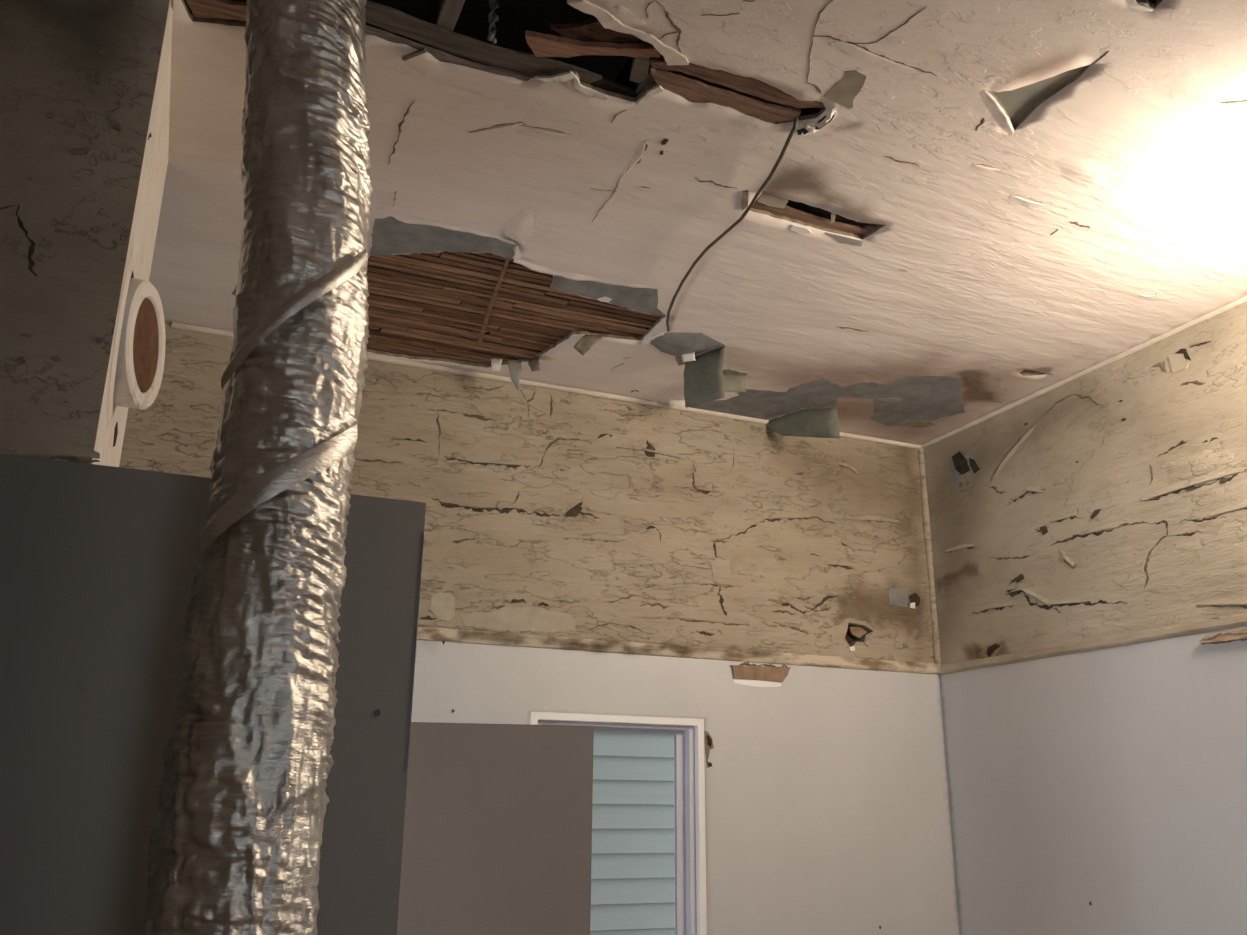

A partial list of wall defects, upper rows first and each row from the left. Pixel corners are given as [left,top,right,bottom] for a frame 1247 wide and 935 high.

spalling [171,0,247,21]
spalling [365,0,866,123]
crack [645,0,755,54]
crack [806,0,937,94]
peeling [976,51,1109,133]
crack [971,164,1090,235]
flaking render [366,213,966,439]
crack [1180,379,1206,387]
crack [355,357,738,543]
crack [940,394,1247,619]
crack [589,512,899,637]
spalling [843,617,874,652]